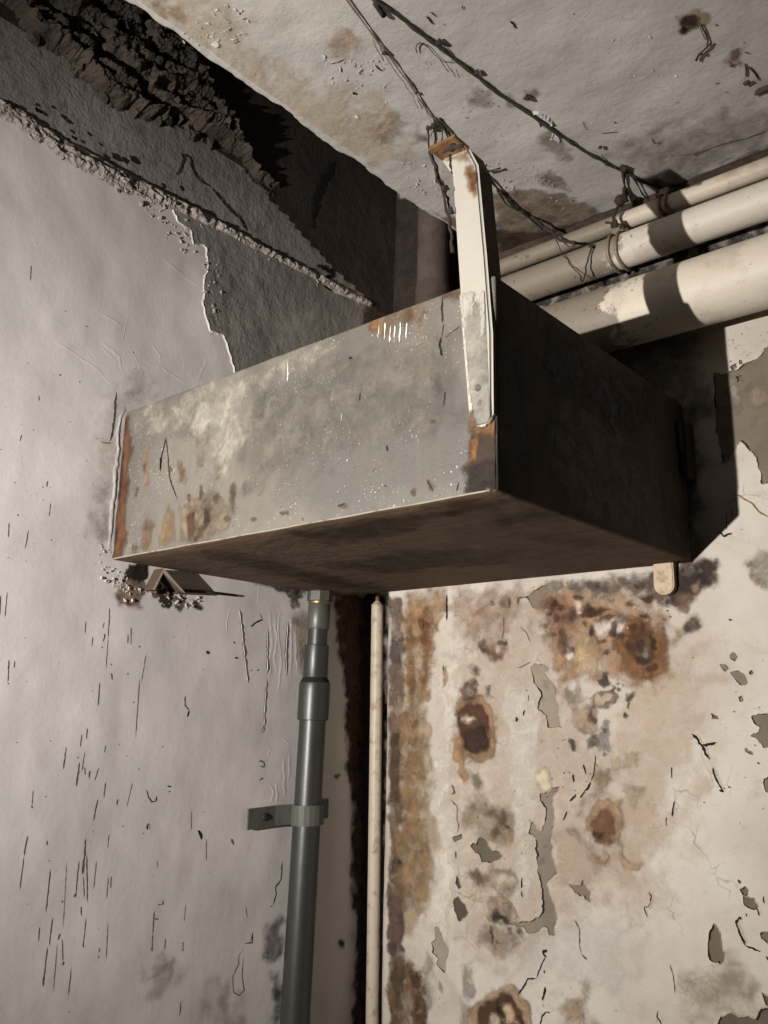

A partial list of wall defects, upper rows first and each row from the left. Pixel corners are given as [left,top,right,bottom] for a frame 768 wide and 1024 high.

spalling [0,0,280,197]
flaking render [0,98,372,373]
crack [101,392,117,444]
peeling [713,332,768,485]
water stain [545,573,652,614]
efflorescence [595,619,625,637]
mould [683,618,700,632]
crack [692,732,725,792]
water stain [387,598,539,1024]
peeling [504,767,585,936]
crack [735,896,768,960]
crack [233,935,253,996]